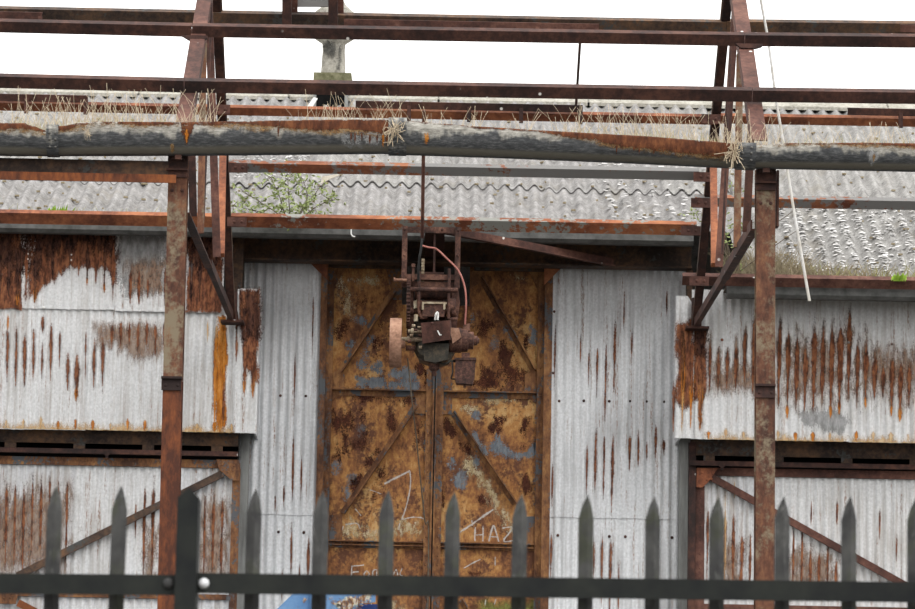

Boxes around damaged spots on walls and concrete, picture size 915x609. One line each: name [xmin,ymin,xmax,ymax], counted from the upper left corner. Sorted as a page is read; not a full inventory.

corrosion [0,123,45,135]
corrosion [58,119,389,148]
corrosion [182,237,264,433]
corrosion [672,310,755,440]
corrosion [775,310,915,421]
corrosion [3,417,162,432]
peeling [446,410,536,505]
corrosion [586,430,615,513]
corrosion [628,425,665,471]
corrosion [0,475,73,574]
corrosion [134,476,159,575]
corrosion [724,483,752,580]